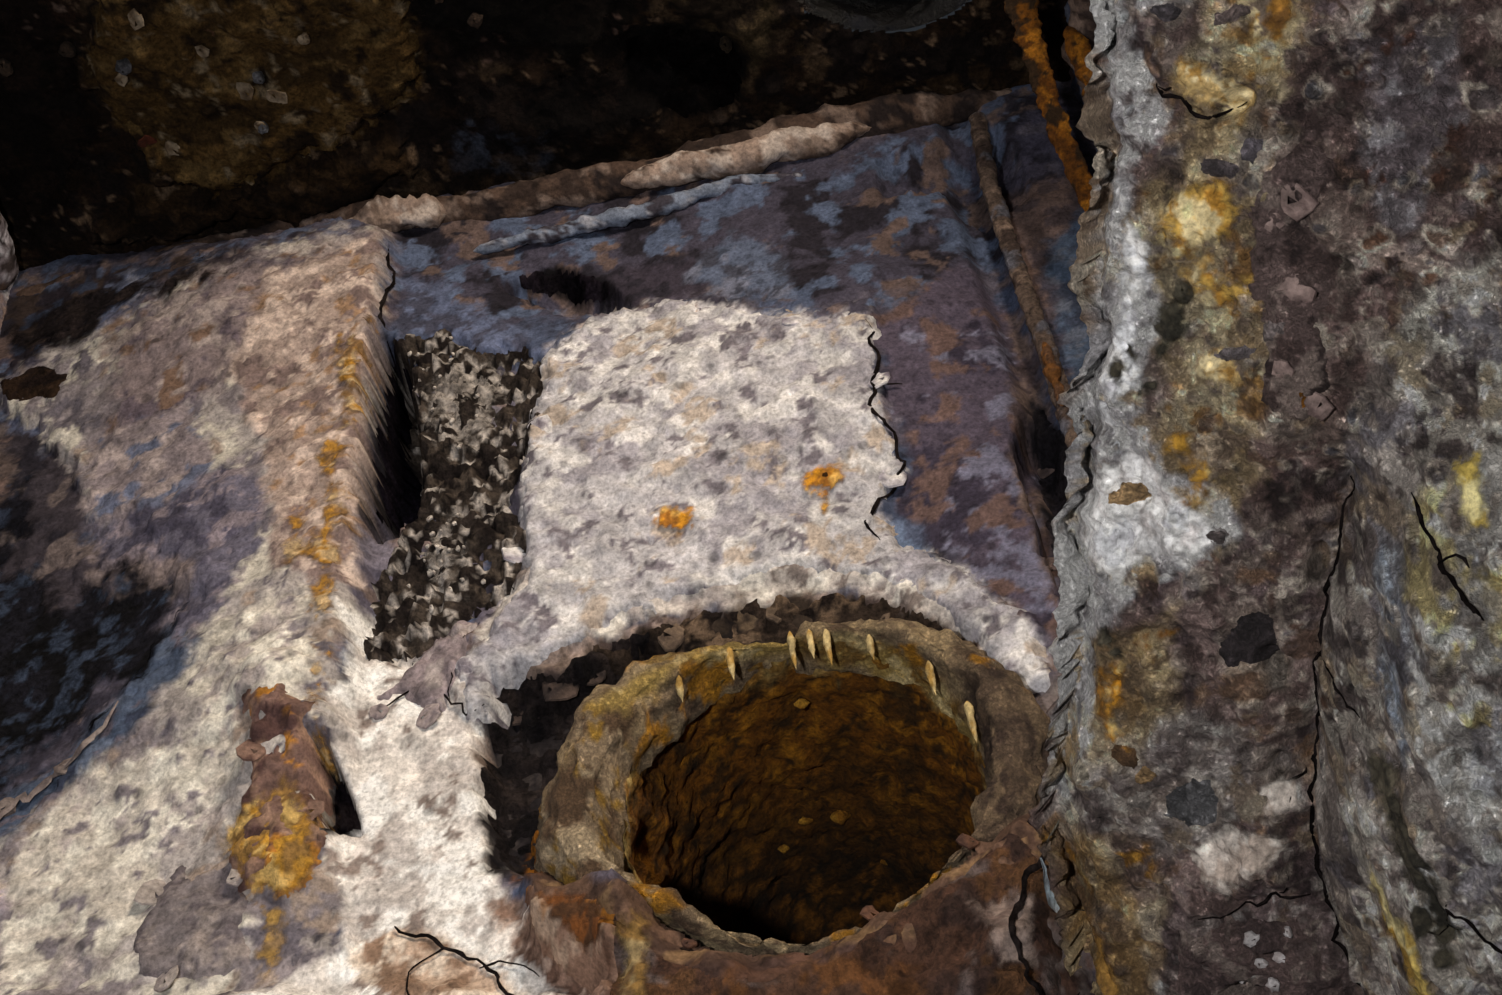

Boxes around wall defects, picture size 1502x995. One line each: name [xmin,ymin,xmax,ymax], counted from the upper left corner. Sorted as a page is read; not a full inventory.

rust [1004,0,1093,212]
rust [1174,0,1296,120]
rust [1160,182,1250,306]
rust [1040,342,1065,406]
leakage [0,474,38,539]
rust [283,315,378,618]
crack [1198,475,1361,987]
rust [226,777,313,892]
rust [255,909,285,965]
crack [394,926,539,995]